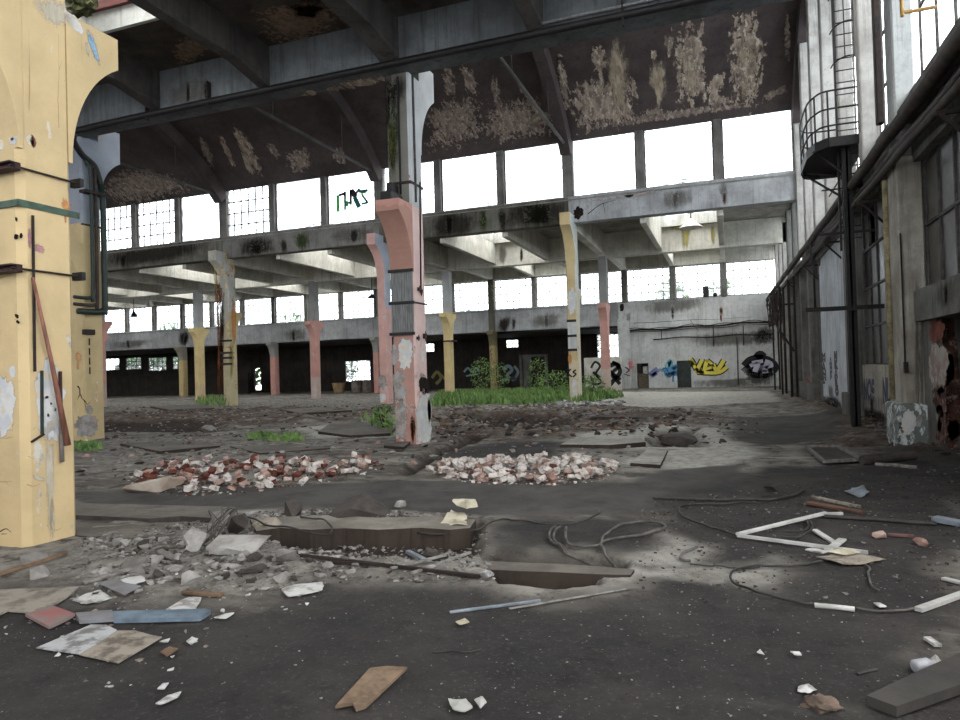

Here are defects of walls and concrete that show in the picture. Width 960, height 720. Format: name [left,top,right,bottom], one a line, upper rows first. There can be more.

peeling [37,0,84,34]
peeling [424,65,555,155]
peeling [557,9,789,135]
peeling [104,168,198,205]
leakage [432,211,486,236]
leakage [499,203,567,231]
corrosion [214,269,236,392]
peeling [0,365,17,438]
peeling [34,358,66,441]
peeling [74,405,99,437]
peeling [377,338,432,443]
spalling [928,318,960,450]